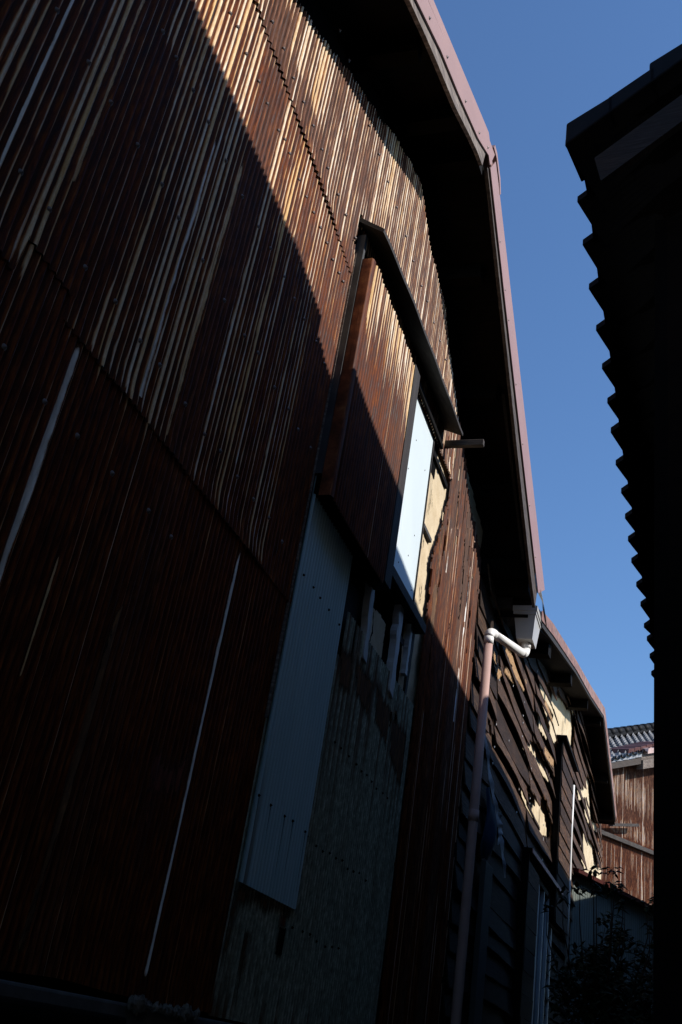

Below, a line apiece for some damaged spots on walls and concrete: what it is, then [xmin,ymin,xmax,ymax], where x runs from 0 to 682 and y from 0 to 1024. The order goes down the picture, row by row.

flaking render [398,449,483,706]
flaking render [519,678,575,784]
flaking render [517,782,550,838]
flaking render [576,766,601,879]